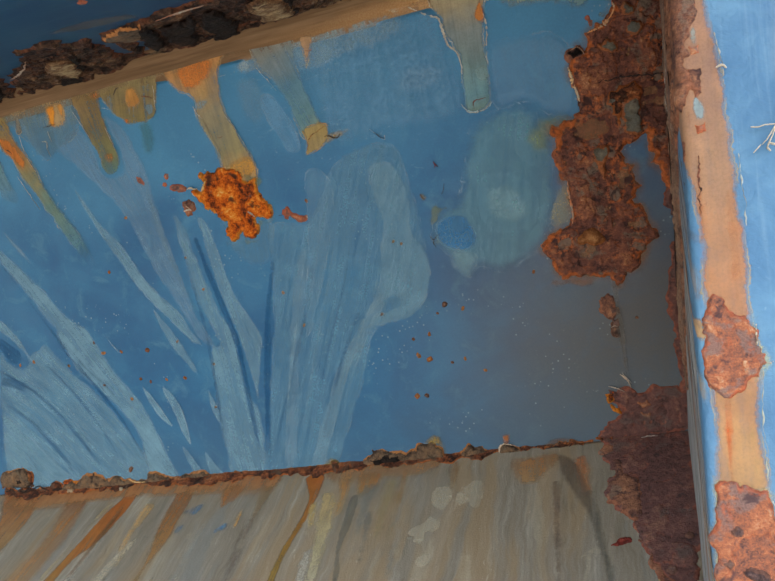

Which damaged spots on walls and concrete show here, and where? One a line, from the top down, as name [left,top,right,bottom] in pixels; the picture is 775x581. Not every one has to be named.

corrosion [389,0,492,113]
corrosion [0,56,274,249]
water stain [118,251,187,335]
corrosion [541,0,775,581]
corrosion [0,437,604,581]